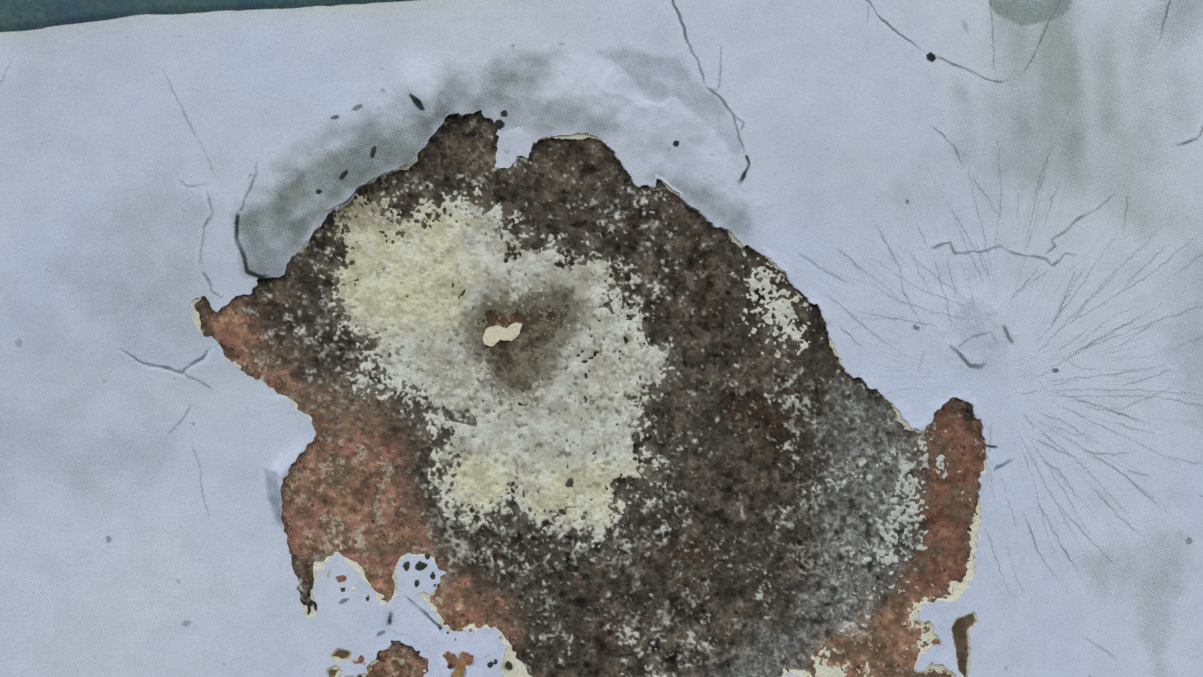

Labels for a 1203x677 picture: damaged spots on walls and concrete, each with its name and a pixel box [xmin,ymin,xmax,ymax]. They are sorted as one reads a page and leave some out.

crack [862,0,962,67]
crack [669,0,750,181]
crack [935,241,1061,266]
crack [957,327,1013,368]
spalling [192,110,987,677]